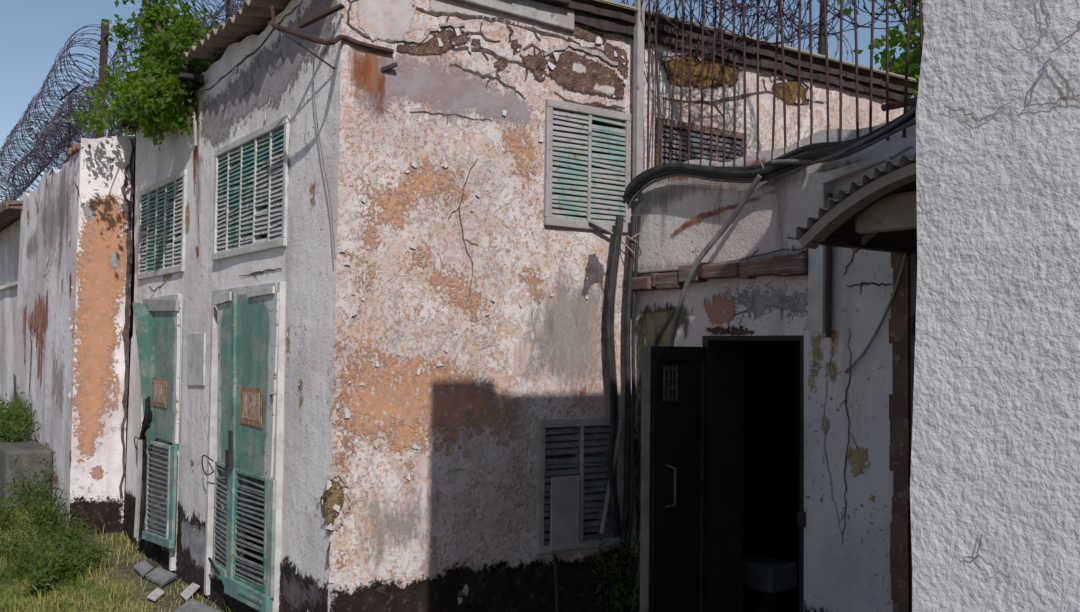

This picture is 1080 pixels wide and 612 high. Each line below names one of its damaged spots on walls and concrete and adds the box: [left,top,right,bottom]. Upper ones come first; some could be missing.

peeling [200,0,337,148]
peeling [360,22,628,190]
spalling [658,50,743,96]
spalling [769,74,816,108]
crack [944,0,1080,130]
peeling [22,157,133,480]
peeling [702,279,838,399]
peeling [280,337,526,612]
damp [633,303,693,550]